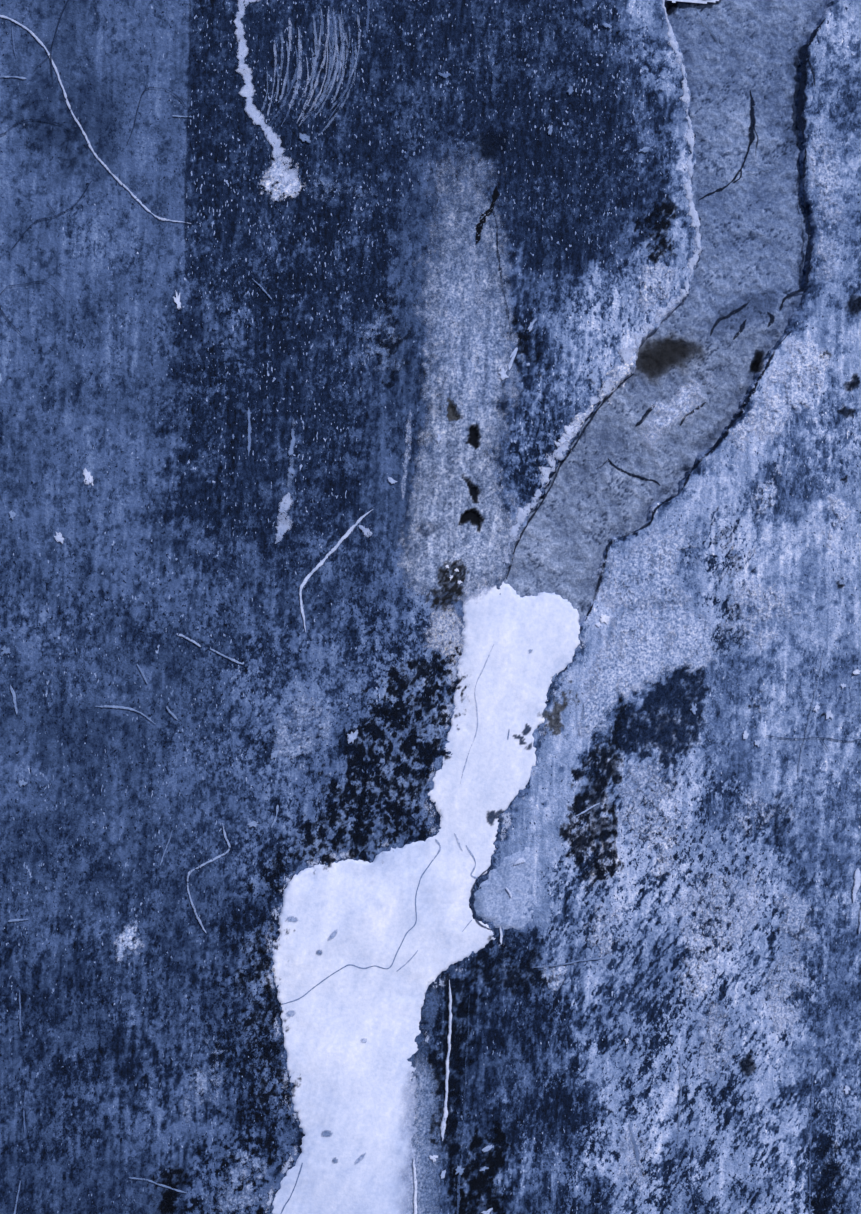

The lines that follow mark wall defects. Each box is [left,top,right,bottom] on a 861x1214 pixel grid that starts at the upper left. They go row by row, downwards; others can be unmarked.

crack [585,18,826,621]
spalling [446,398,481,449]
spalling [502,0,845,876]
spalling [458,476,484,532]
crack [506,373,634,579]
peeling [276,696,329,770]
peeling [487,809,504,825]
peeling [542,966,568,990]
peeling [418,989,440,1070]